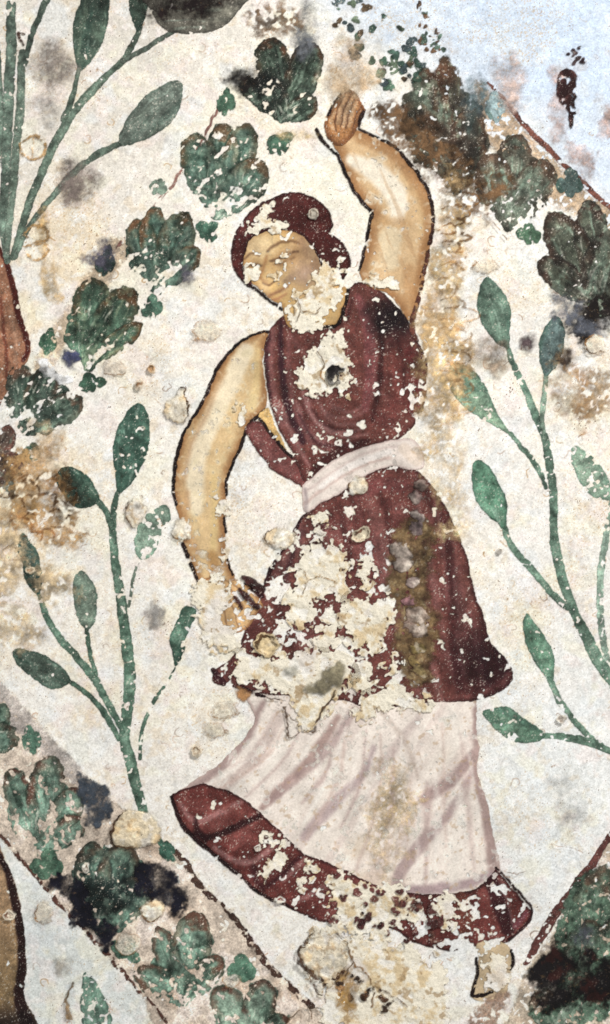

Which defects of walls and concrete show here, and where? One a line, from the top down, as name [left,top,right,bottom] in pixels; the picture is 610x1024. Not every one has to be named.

peeling [245,201,289,235]
peeling [243,250,289,284]
spalling [284,257,400,400]
peeling [232,402,247,427]
peeling [213,494,232,516]
damp [386,480,460,687]
spalling [189,511,436,732]
peeling [254,830,288,884]
spalling [296,858,461,1024]